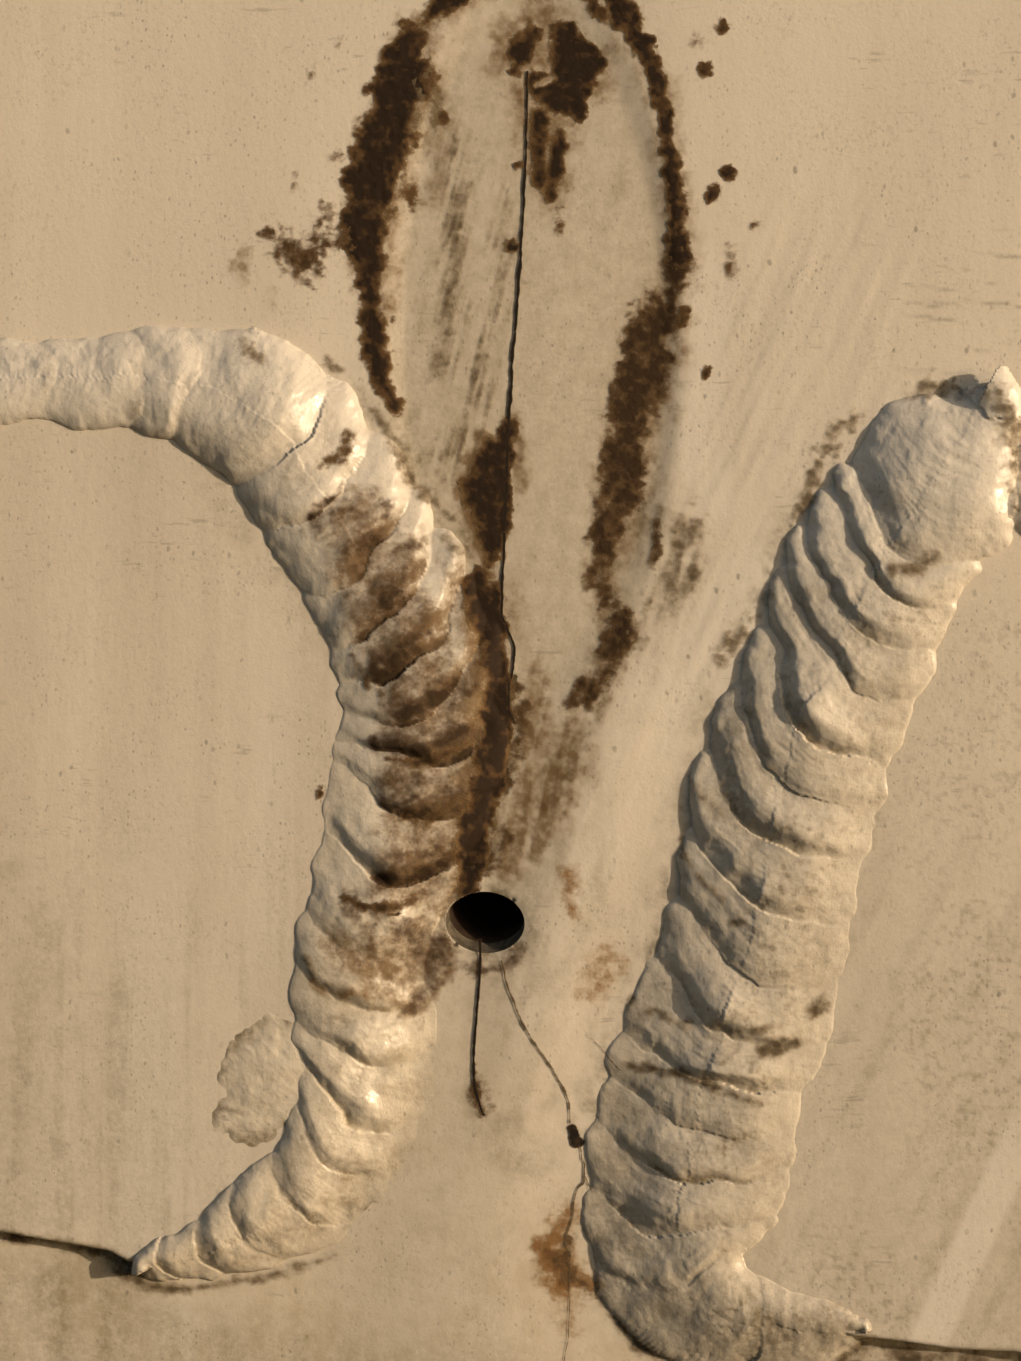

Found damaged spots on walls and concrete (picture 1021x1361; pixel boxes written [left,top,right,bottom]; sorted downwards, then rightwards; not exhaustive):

rust [697,61,714,78]
rust [716,18,730,35]
rust [257,0,469,417]
rust [704,164,738,205]
crack [500,71,529,724]
rust [702,365,713,380]
rust [306,0,695,1015]
crack [472,939,591,1361]
rust [531,1207,601,1297]